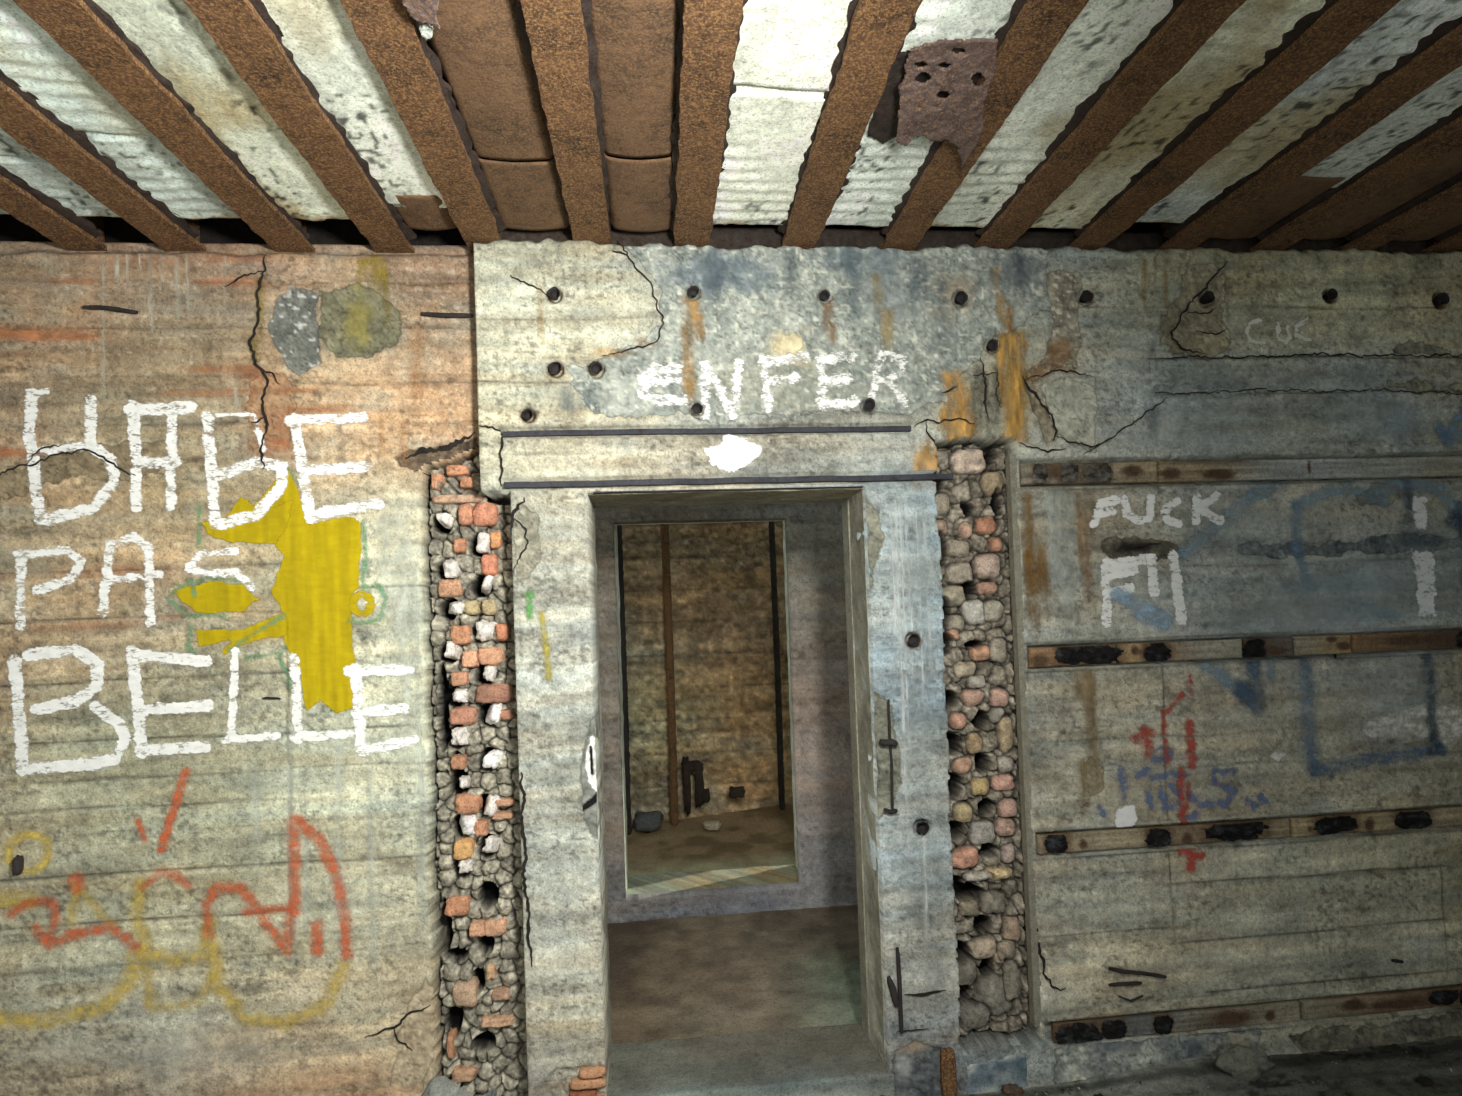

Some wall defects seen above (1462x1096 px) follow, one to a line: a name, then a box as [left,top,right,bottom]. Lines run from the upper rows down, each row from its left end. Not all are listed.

rust [249,0,417,241]
rust [402,0,507,232]
rust [513,0,571,229]
rust [821,0,1027,235]
crack [225,254,279,469]
spalling [244,282,402,446]
crack [603,241,664,356]
crack [914,261,1462,454]
spalling [379,438,541,1096]
spalling [580,718,598,838]
spalling [874,691,902,819]
spalling [932,444,1029,1037]